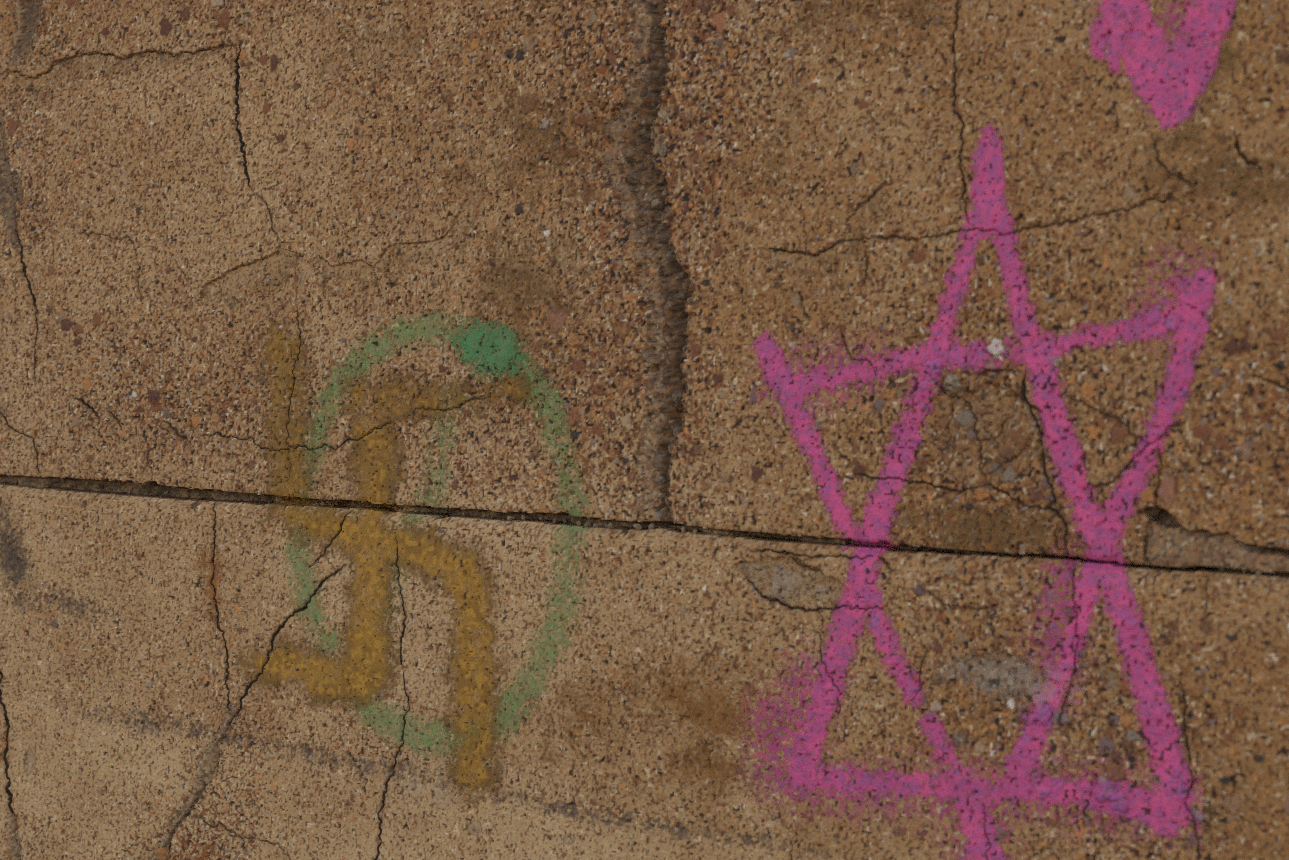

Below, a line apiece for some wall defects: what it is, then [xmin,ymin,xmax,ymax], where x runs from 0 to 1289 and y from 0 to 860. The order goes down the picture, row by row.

crack [0,43,280,240]
crack [764,0,1193,287]
crack [1234,132,1262,176]
crack [15,212,38,382]
crack [79,232,141,298]
crack [602,0,694,524]
crack [841,328,876,375]
crack [856,369,1080,733]
crack [1068,396,1184,563]
crack [0,672,21,860]
crack [186,503,352,860]
crack [374,537,410,860]